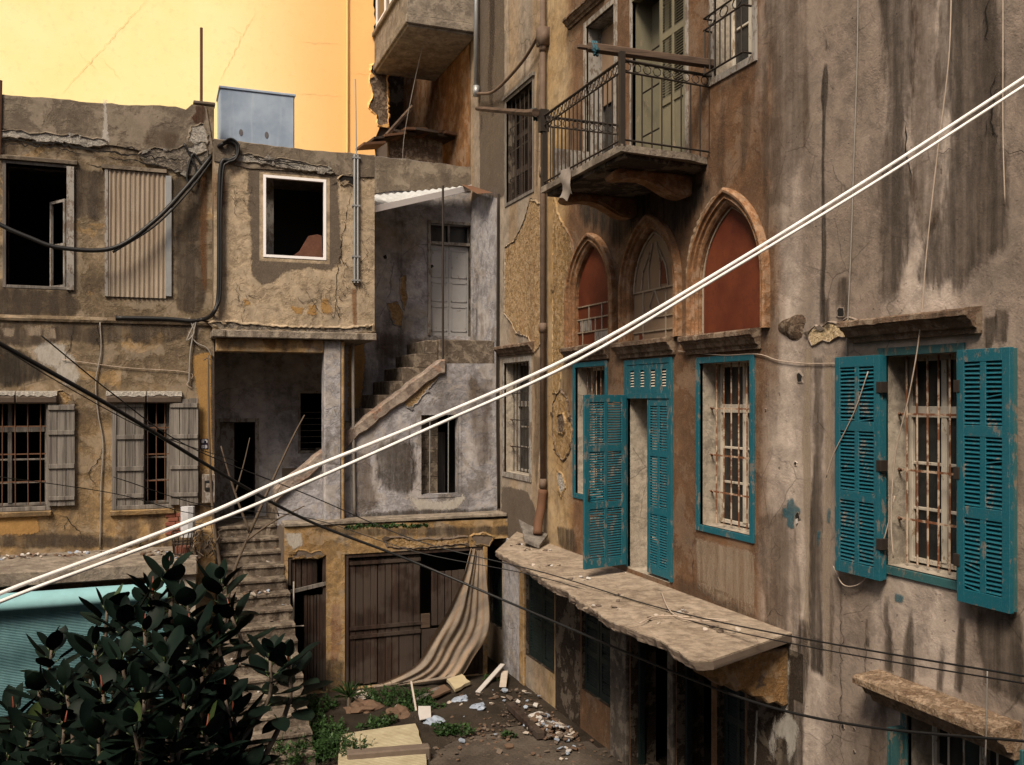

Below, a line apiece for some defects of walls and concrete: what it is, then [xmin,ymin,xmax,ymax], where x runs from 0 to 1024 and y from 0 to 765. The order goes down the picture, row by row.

flaking render [1,128,109,148]
flaking render [138,122,210,177]
crack [298,177,377,322]
flaking render [367,63,390,128]
leakage [820,67,829,329]
leakage [880,0,916,292]
leakage [918,0,1007,287]
flaking render [208,298,375,421]
flaking render [503,197,574,498]
leakage [754,350,832,765]
leakage [886,616,914,682]
leakage [956,619,964,691]